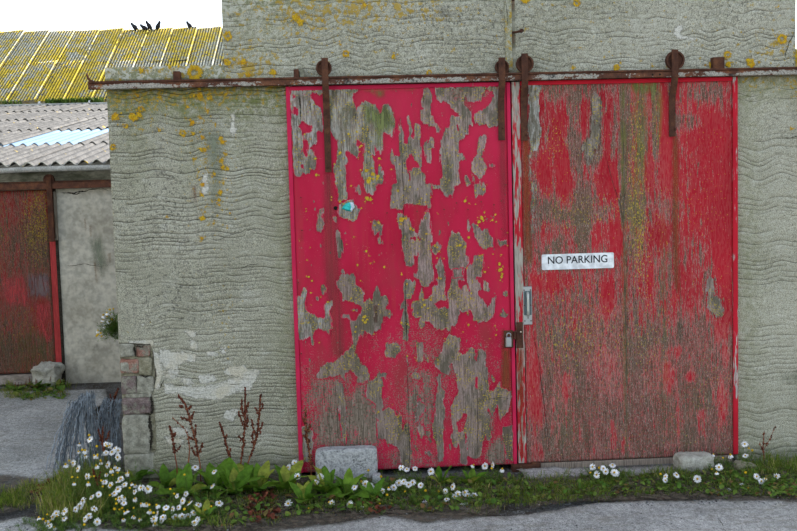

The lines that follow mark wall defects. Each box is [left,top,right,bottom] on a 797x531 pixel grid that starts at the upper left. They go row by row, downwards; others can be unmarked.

peeling [524,85,542,262]
peeling [581,92,603,165]
peeling [289,85,514,469]
peeling [705,277,724,322]